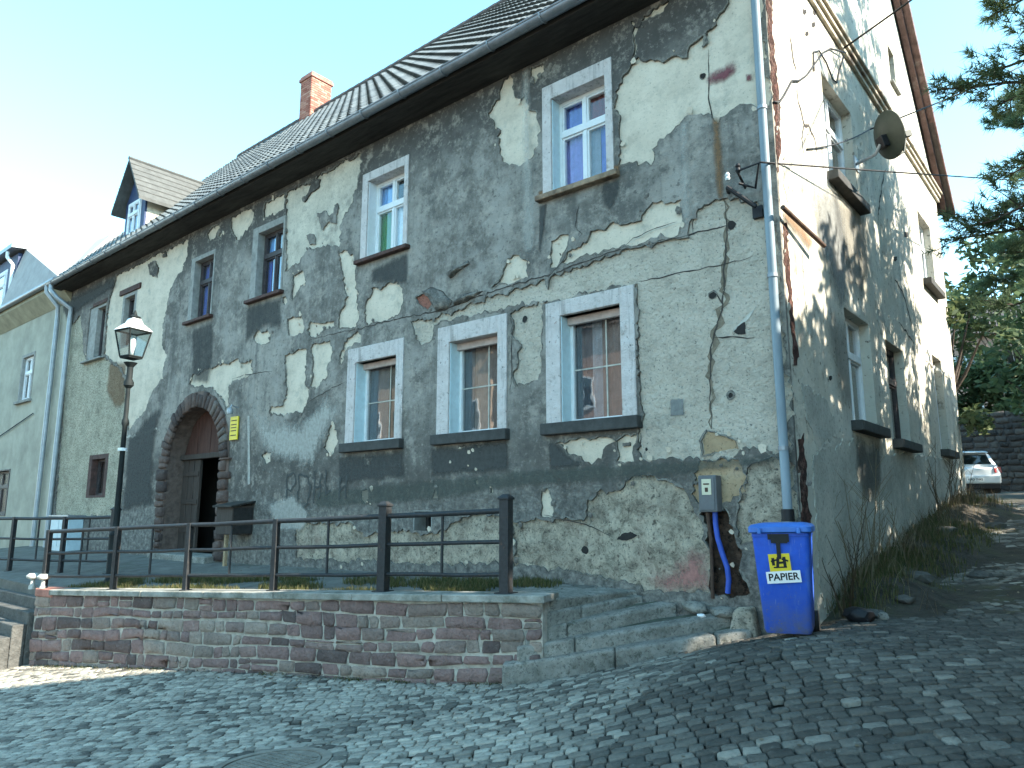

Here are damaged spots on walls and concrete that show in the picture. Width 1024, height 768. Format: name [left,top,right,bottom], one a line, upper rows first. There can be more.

flaking render [486,75,540,166]
flaking render [613,0,781,172]
flaking render [54,239,189,516]
flaking render [189,358,253,411]
flaking render [206,151,814,599]
crack [311,199,752,429]